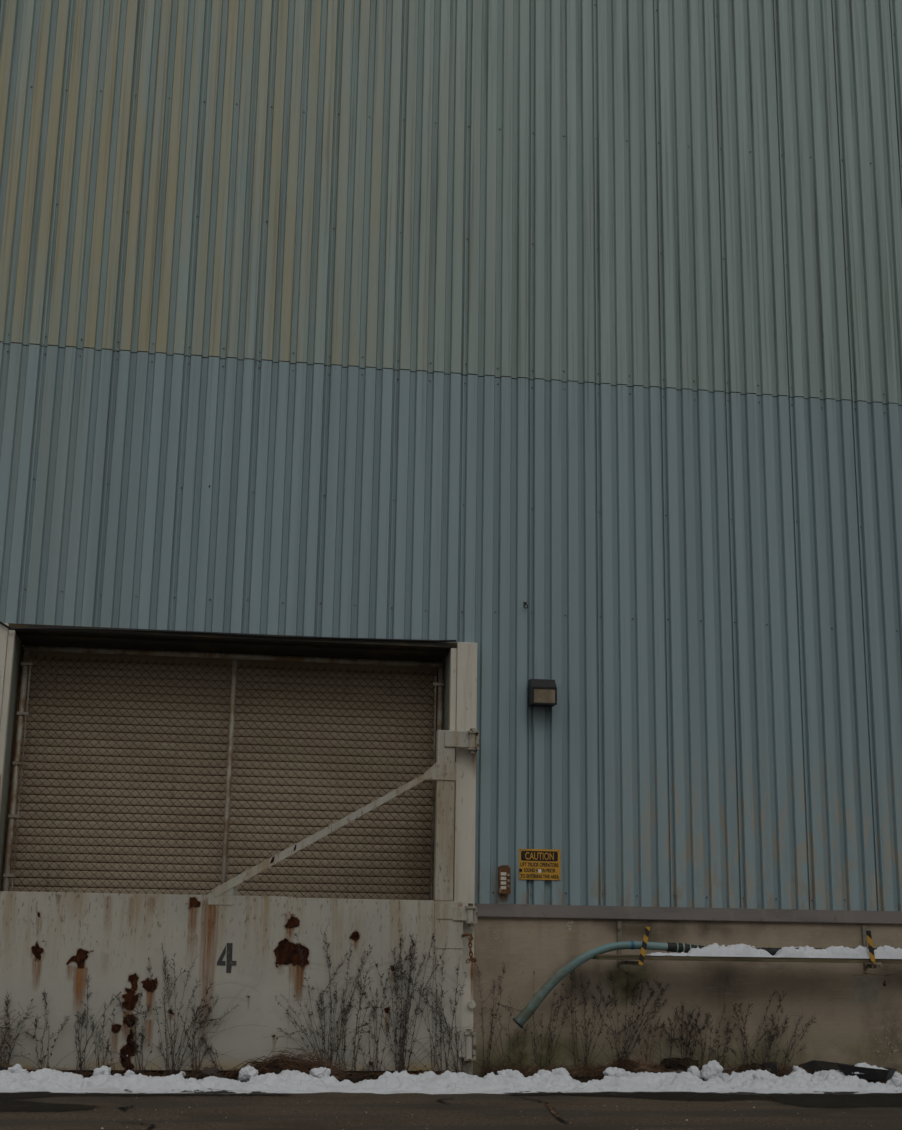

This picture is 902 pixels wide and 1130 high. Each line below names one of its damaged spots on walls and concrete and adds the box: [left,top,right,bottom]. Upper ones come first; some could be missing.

corrosion [31,941,44,974]
corrosion [67,941,97,1001]
corrosion [186,897,215,956]
corrosion [274,912,309,985]
corrosion [112,973,158,1071]